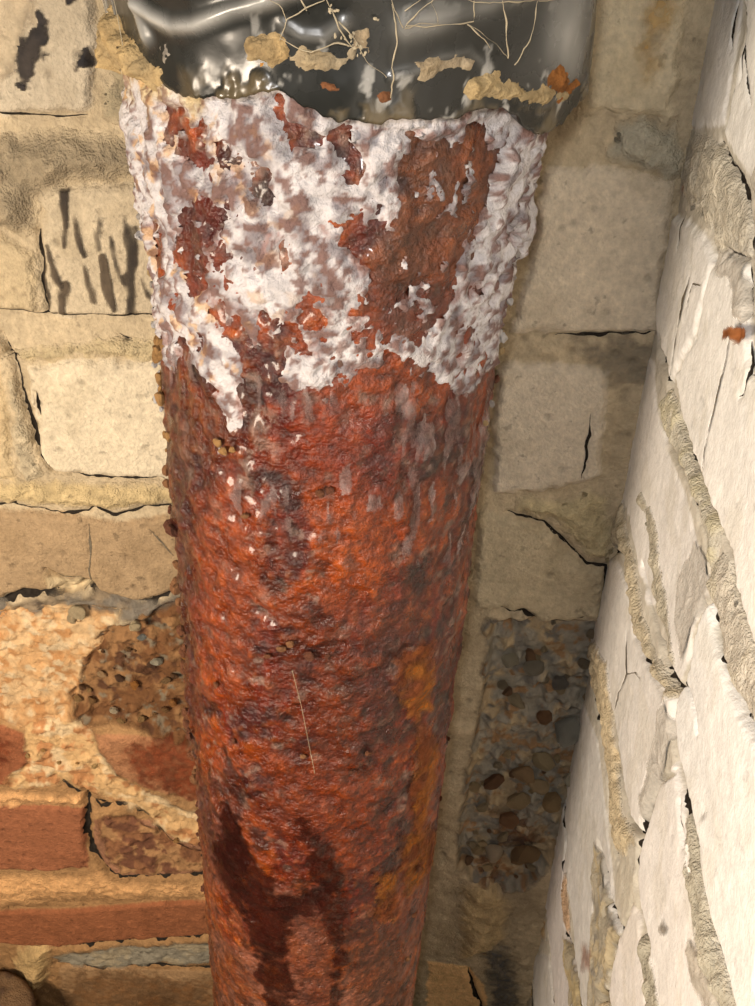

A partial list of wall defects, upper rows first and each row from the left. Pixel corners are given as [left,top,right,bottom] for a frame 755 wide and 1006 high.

leakage [118,69,549,433]
crack [0,228,152,463]
corrosion [152,335,165,407]
crack [75,471,166,479]
corrosion [213,438,236,456]
corrosion [163,504,178,537]
leakage [211,802,350,1006]